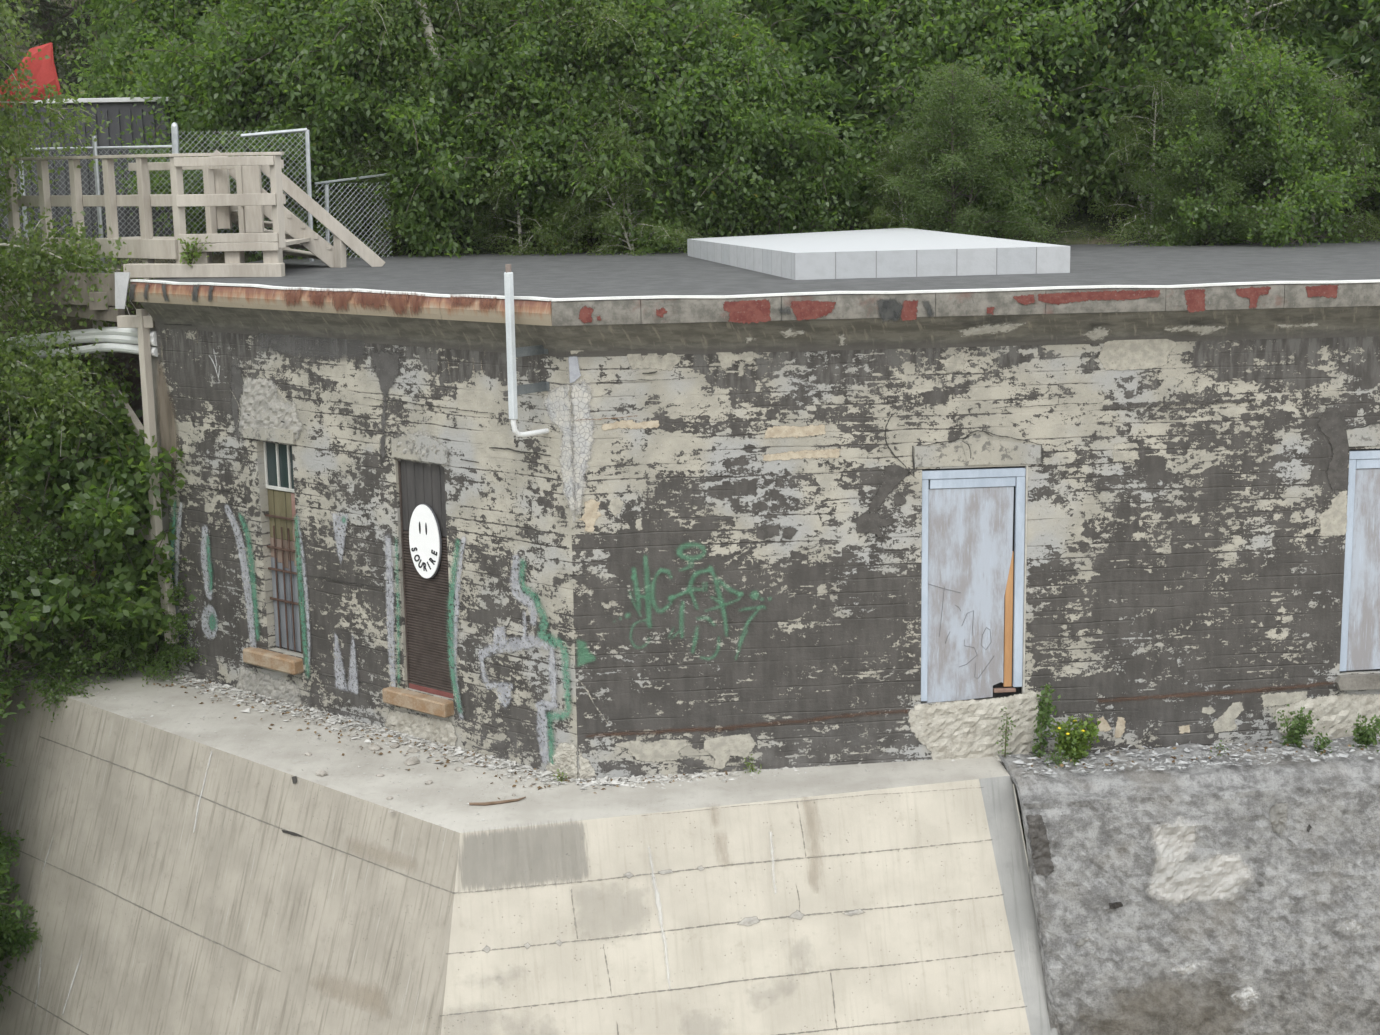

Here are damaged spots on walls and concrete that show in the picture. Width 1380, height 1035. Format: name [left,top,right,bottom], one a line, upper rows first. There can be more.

rust [284,289,425,315]
rust [450,295,496,310]
peeling [627,353,681,371]
peeling [716,352,755,376]
peeling [1098,339,1177,371]
spalling [238,378,302,443]
spalling [544,350,659,532]
peeling [1319,490,1347,537]
spalling [908,691,1039,767]
peeling [1202,702,1244,733]
spalling [1262,691,1380,740]
peeling [615,733,756,769]